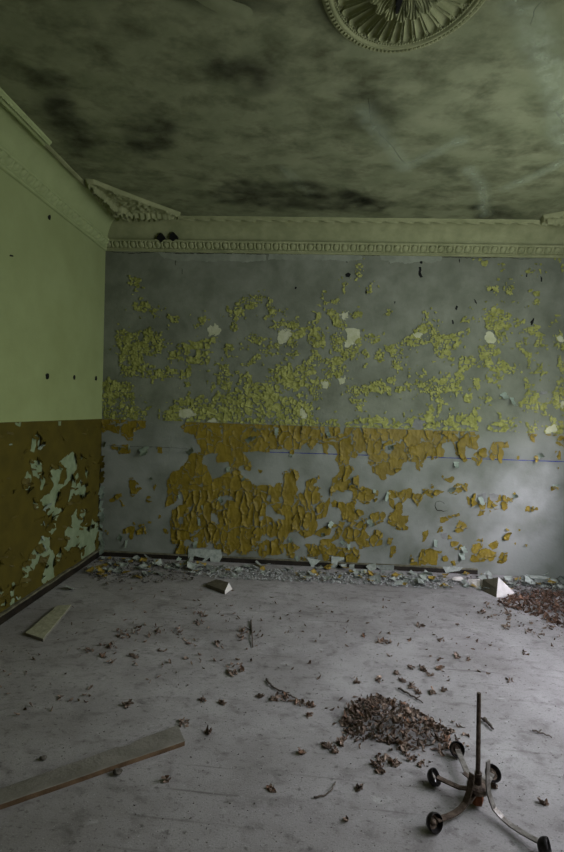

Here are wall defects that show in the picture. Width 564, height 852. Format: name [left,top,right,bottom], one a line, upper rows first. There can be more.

peeling [0,258,564,609]